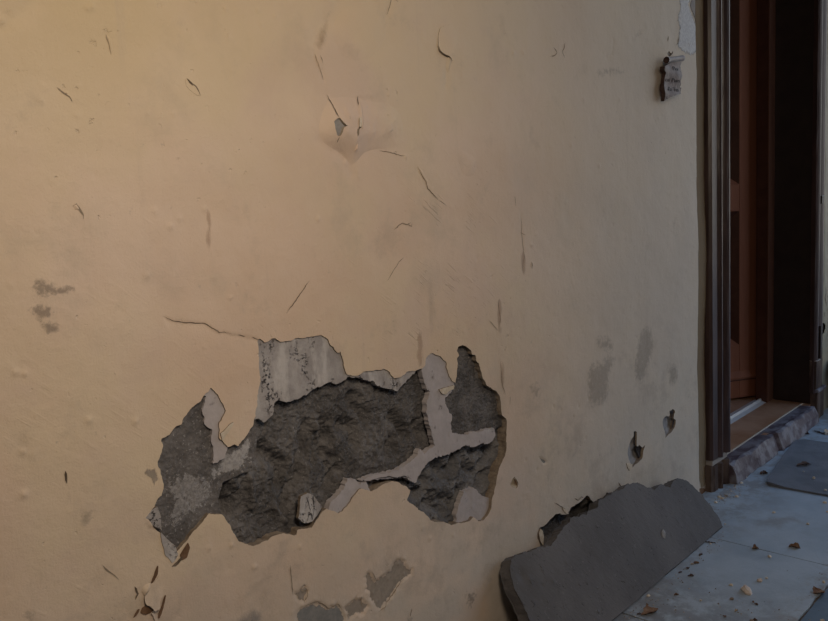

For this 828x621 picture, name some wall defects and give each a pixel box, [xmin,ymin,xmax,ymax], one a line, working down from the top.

crack [167,318,259,340]
flaking render [663,410,674,437]
flaking render [146,335,502,567]
flaking render [626,432,641,471]
flaking render [537,496,593,547]
peeling [133,566,166,621]
peeling [296,560,411,621]